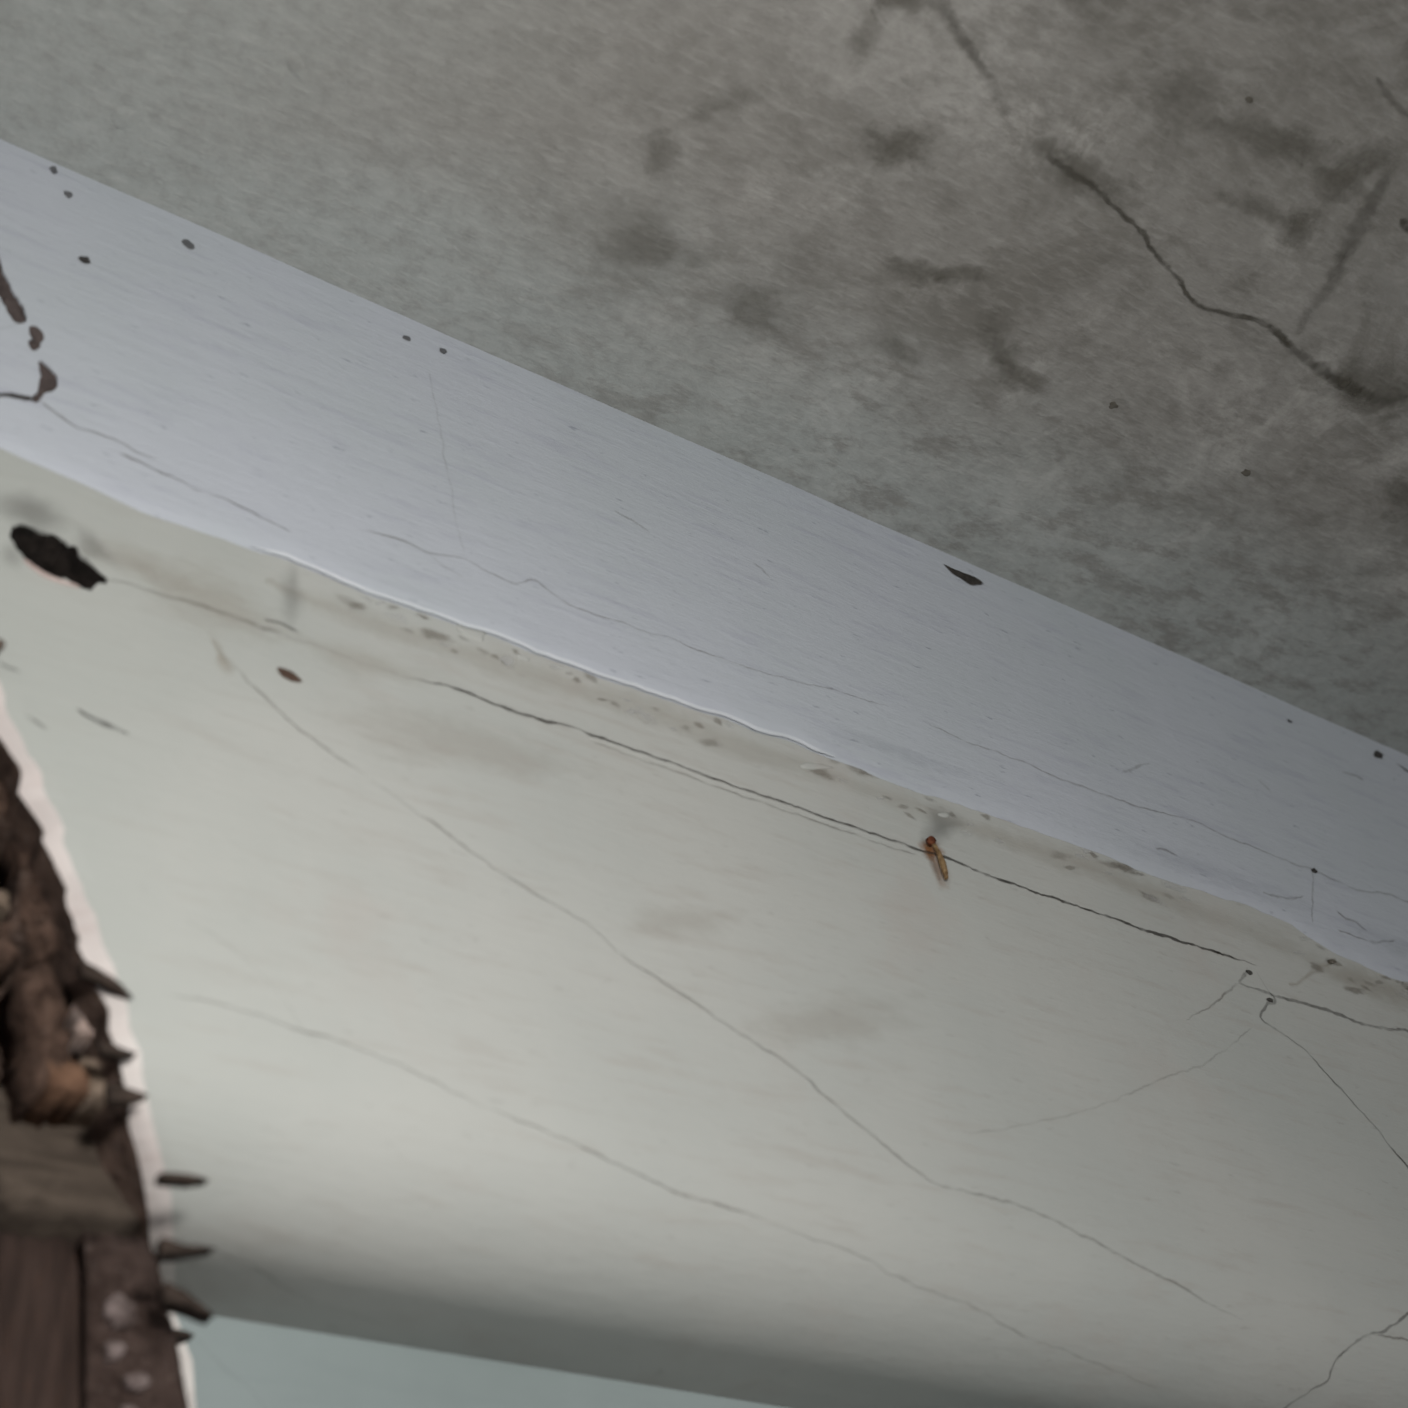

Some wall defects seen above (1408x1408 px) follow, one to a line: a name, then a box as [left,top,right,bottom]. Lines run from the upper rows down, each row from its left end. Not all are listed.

peeling [102,1293,151,1408]